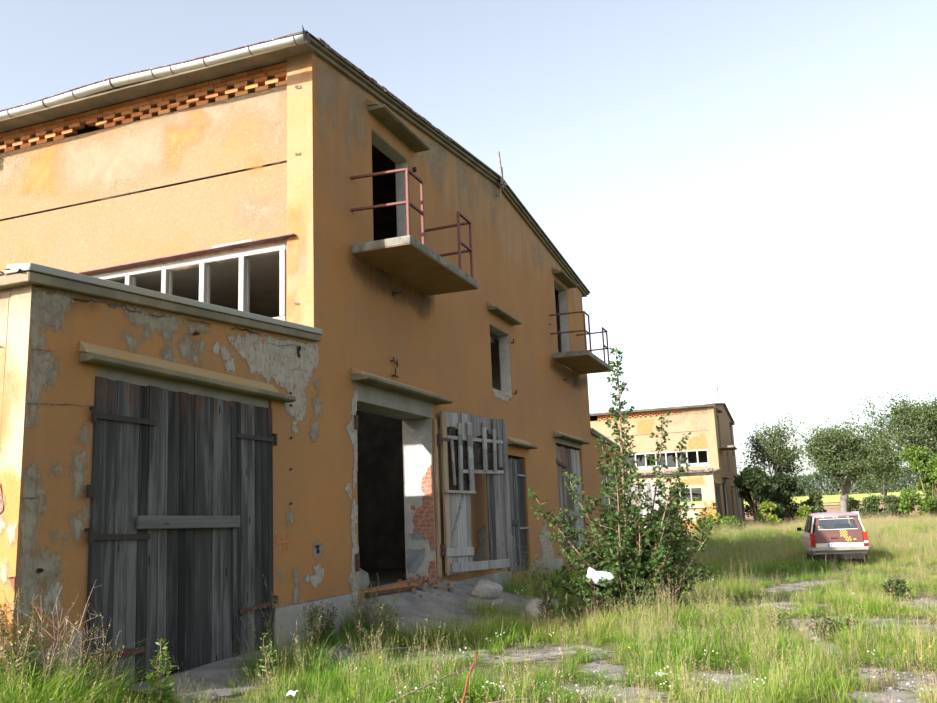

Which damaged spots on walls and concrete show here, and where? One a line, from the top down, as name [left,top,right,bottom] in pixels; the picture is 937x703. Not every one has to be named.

peeling [25,289,77,429]
peeling [91,297,323,441]
peeling [0,462,62,620]
peeling [51,425,90,544]
peeling [293,542,324,604]
peeling [345,388,360,593]
flaking render [411,465,435,550]